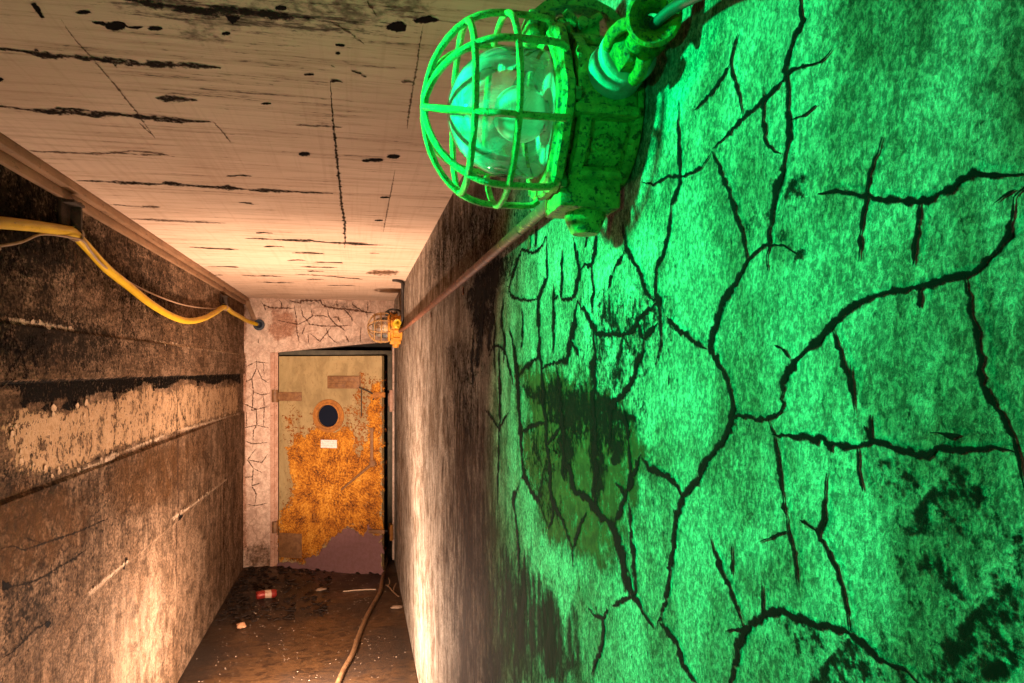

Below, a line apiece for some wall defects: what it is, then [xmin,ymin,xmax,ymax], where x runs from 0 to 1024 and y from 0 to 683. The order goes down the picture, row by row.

crack [0,28,230,157]
crack [87,71,394,343]
peeling [1,384,238,478]
crack [222,339,269,588]
corrosion [276,372,387,564]
leakage [426,177,594,683]
leakage [514,289,672,573]
crack [470,0,1024,683]
leakage [877,456,989,610]
leakage [922,529,1024,683]